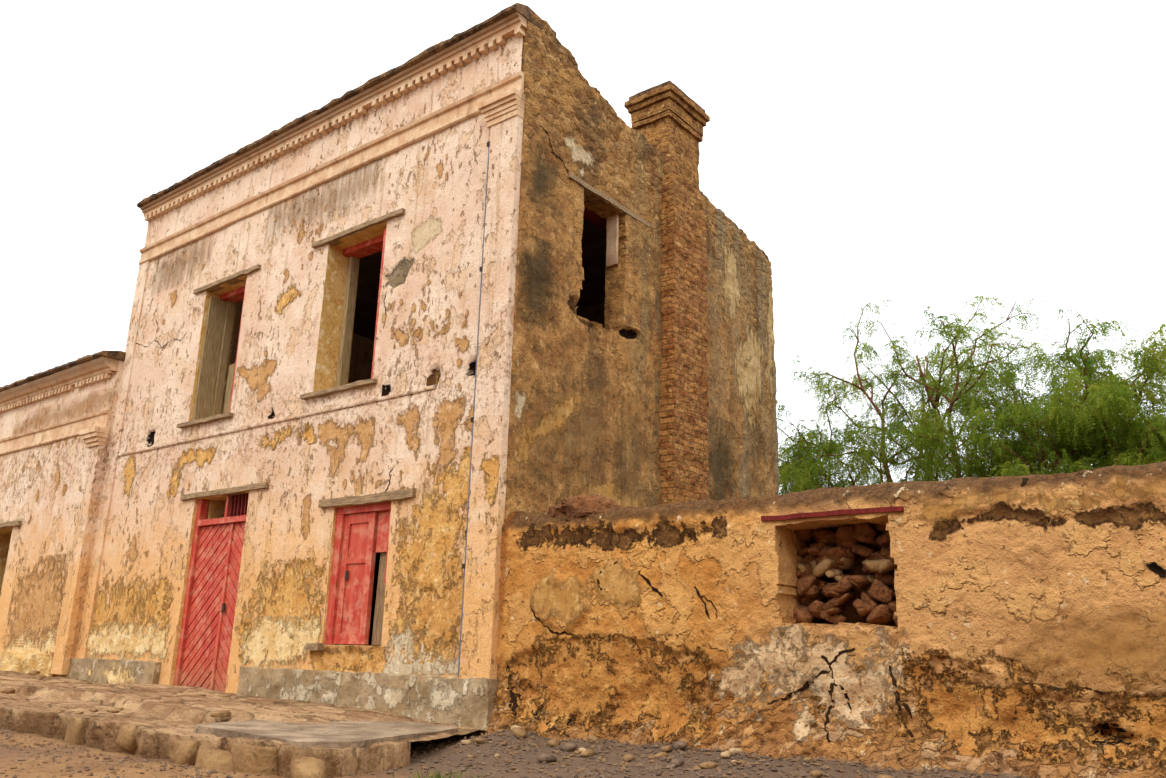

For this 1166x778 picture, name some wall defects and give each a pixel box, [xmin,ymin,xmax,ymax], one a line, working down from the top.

peeling [422,146,462,181]
peeling [22,451,81,496]
peeling [166,445,216,497]
peeling [234,204,499,711]
peeling [3,542,70,649]
peeling [90,519,176,634]
crack [597,562,663,596]
crack [694,586,717,619]
crack [768,648,855,742]
spalling [499,624,1166,771]